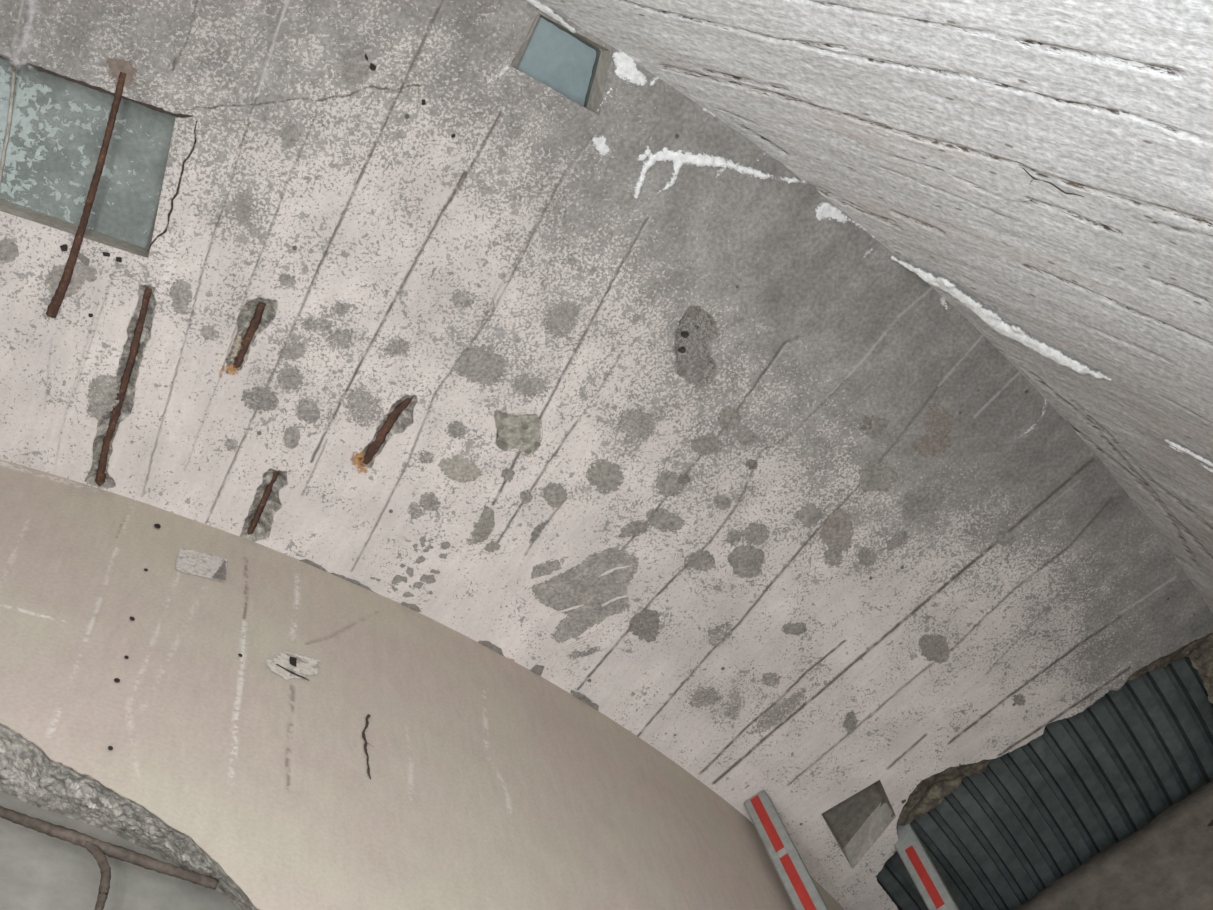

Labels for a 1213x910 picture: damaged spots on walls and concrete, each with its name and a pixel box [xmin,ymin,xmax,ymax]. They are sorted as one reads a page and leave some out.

crack [148,84,421,251]
efflorescence [633,146,805,200]
crack [1023,168,1084,197]
efflorescence [891,256,1112,381]
spalling [85,279,192,489]
efflorescence [1164,439,1213,473]
peeling [918,634,950,664]
peeling [1012,694,1026,706]
spalling [1125,633,1213,704]
crack [362,714,371,780]
spalling [0,724,259,910]
spalling [891,759,992,826]